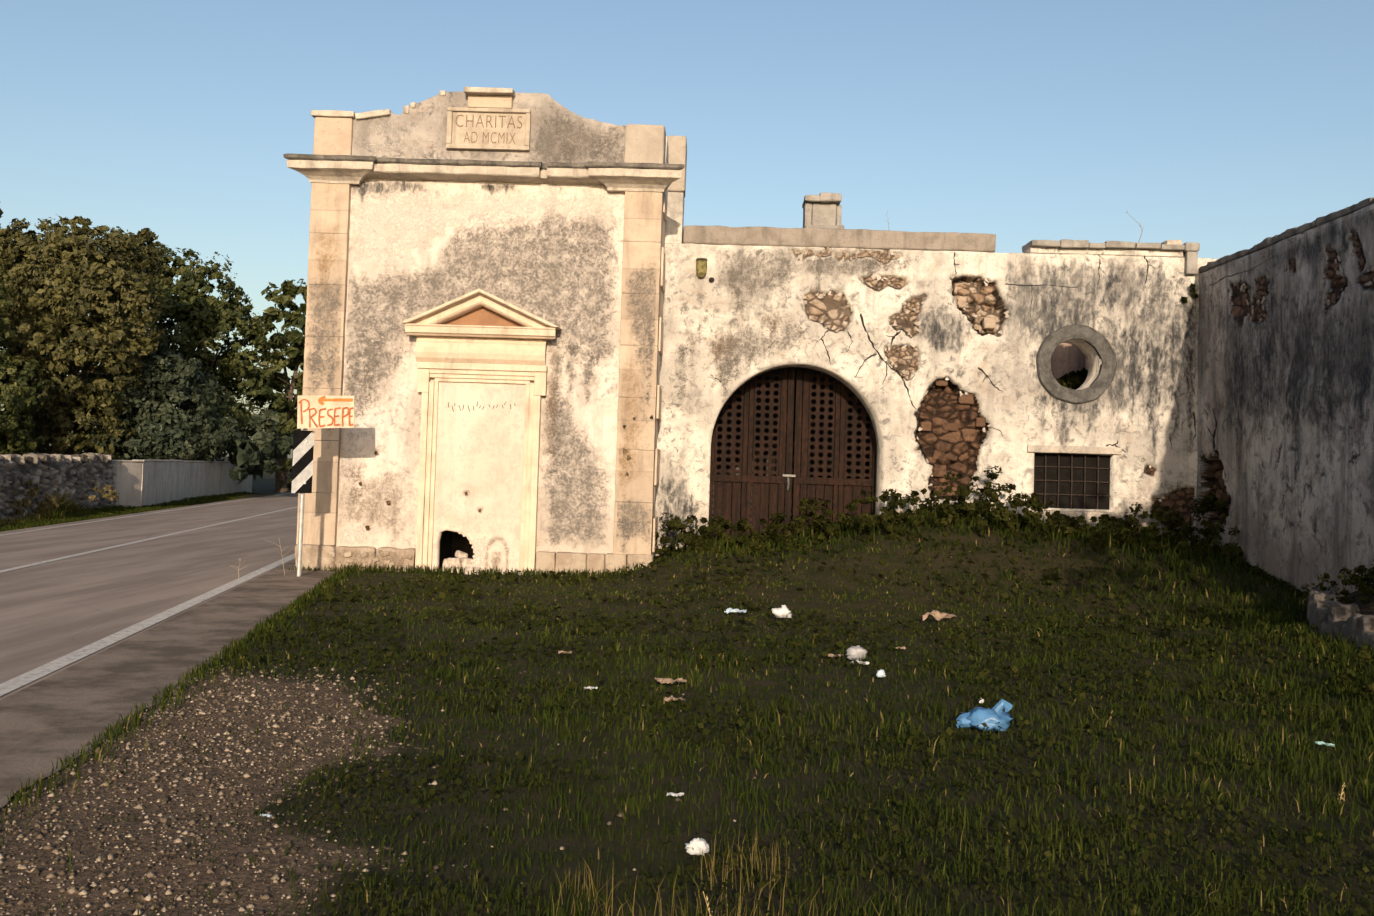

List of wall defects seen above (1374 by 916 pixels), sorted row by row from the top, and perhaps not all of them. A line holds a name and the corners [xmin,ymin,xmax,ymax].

water stain [357,181,416,196]
water stain [307,218,697,547]
spalling [792,247,927,380]
spalling [916,377,991,500]
spalling [951,262,1167,335]
water stain [1032,286,1199,451]
water stain [1220,210,1374,473]